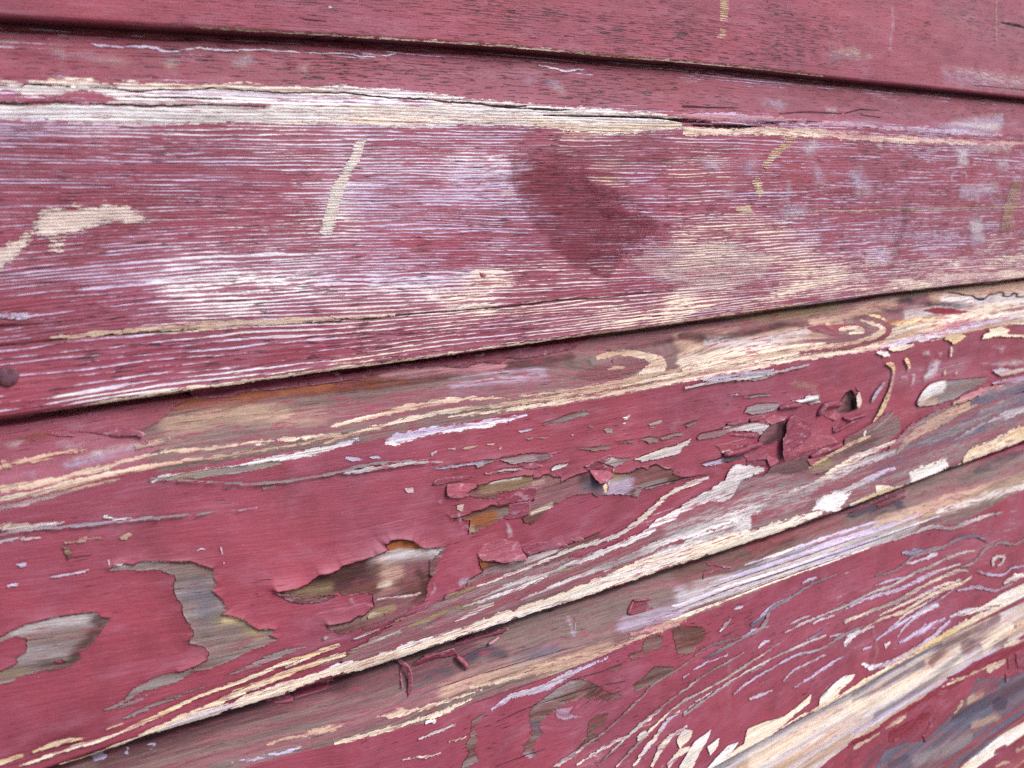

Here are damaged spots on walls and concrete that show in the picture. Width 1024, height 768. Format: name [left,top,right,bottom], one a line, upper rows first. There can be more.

crack [0,83,880,130]
peeling [877,344,914,357]
peeling [982,322,1024,339]
peeling [917,370,988,407]
peeling [430,393,865,534]
peeling [0,521,64,544]
peeling [276,540,446,634]
peeling [0,612,111,684]
peeling [105,561,278,710]
peeling [263,678,333,704]
peeling [608,625,706,691]
peeling [677,674,855,768]